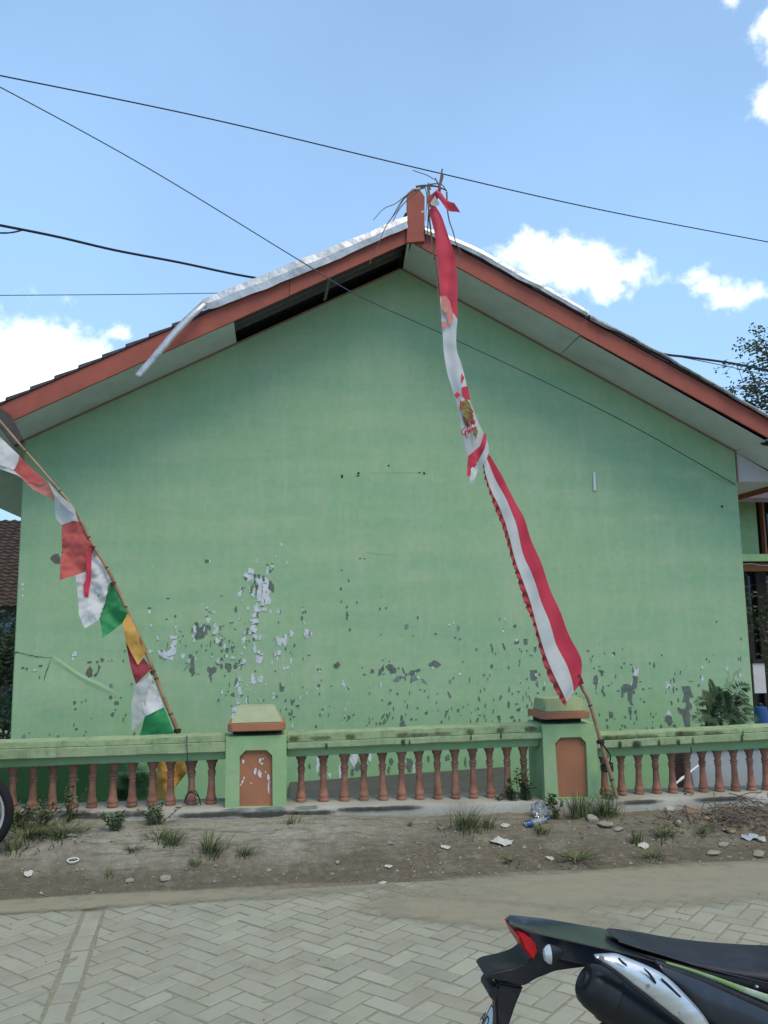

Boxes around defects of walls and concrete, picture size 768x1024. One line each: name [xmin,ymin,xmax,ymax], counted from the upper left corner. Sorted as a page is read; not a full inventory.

peeling [148,540,355,731]
peeling [362,617,546,727]
peeling [587,644,714,730]
peeling [240,758,270,793]